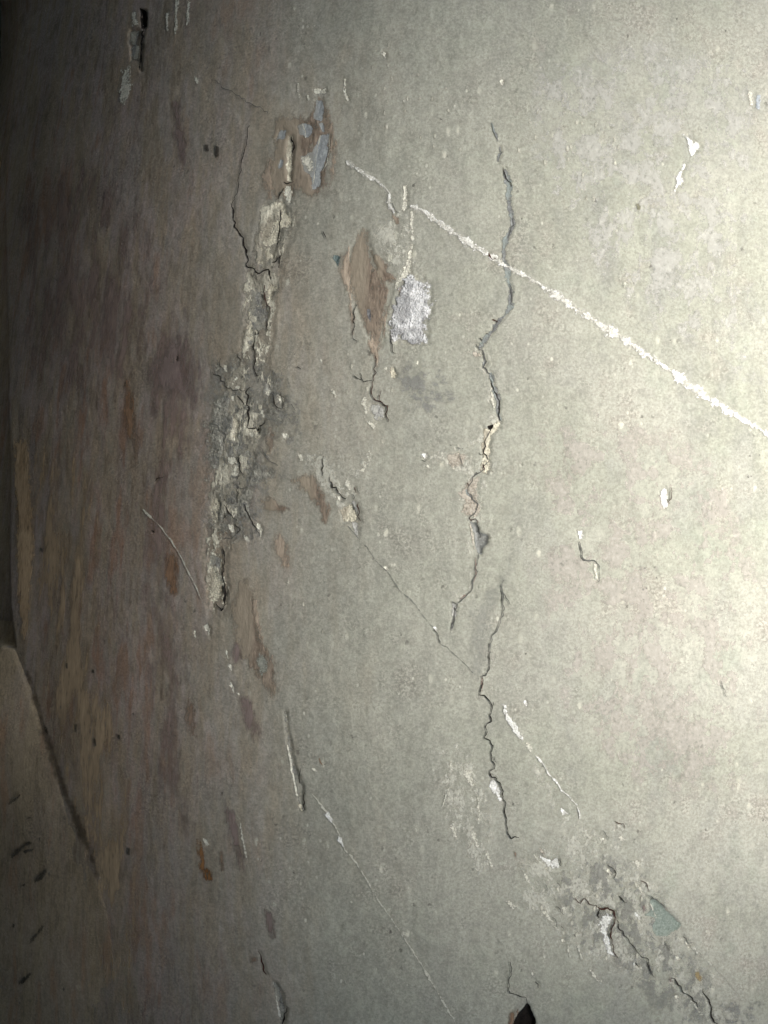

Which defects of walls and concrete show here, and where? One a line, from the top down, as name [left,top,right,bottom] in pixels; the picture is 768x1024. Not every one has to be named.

spalling [119,8,147,105]
peeling [258,88,330,267]
peeling [674,134,700,191]
crack [473,122,515,421]
peeling [202,279,289,542]
crack [354,342,419,421]
crack [467,461,489,518]
spalling [207,548,226,611]
crack [450,554,479,632]
crack [578,531,600,580]
crack [480,580,519,839]
crack [575,865,717,1024]